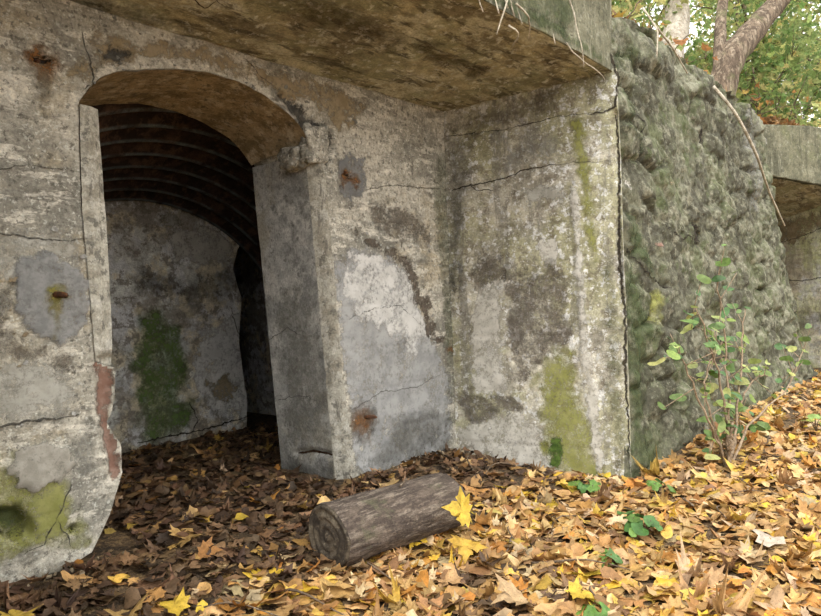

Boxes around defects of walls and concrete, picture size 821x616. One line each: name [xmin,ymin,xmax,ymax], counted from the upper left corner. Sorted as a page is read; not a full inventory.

corrosion [25,45,59,83]
corrosion [341,168,359,191]
crack [354,53,678,457]
peeling [0,226,88,426]
spalling [93,362,121,481]
corrosion [354,409,377,432]